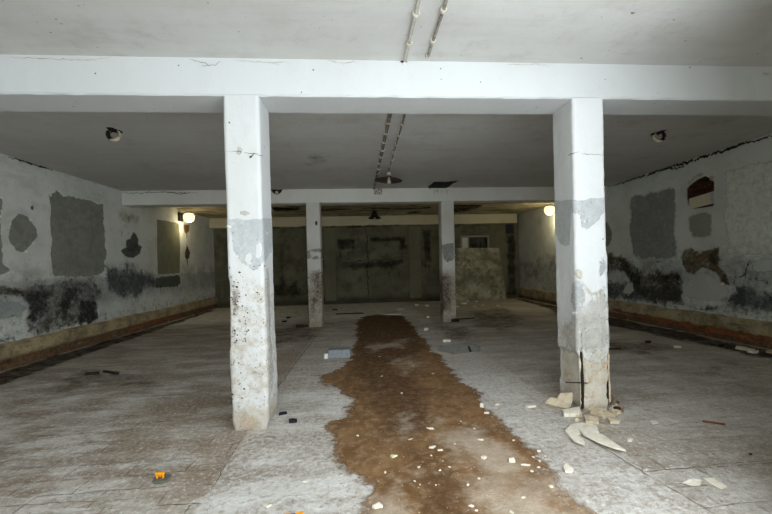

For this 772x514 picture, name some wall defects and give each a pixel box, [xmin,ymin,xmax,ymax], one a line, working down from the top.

crack [608,135,772,187]
peeling [0,196,37,274]
leakage [6,232,180,334]
peeling [227,211,280,351]
leakage [274,270,300,297]
leakage [507,236,516,295]
peeling [554,198,612,246]
peeling [628,184,676,260]
leakage [588,247,772,313]
spalling [687,174,715,237]
spalling [561,257,772,410]